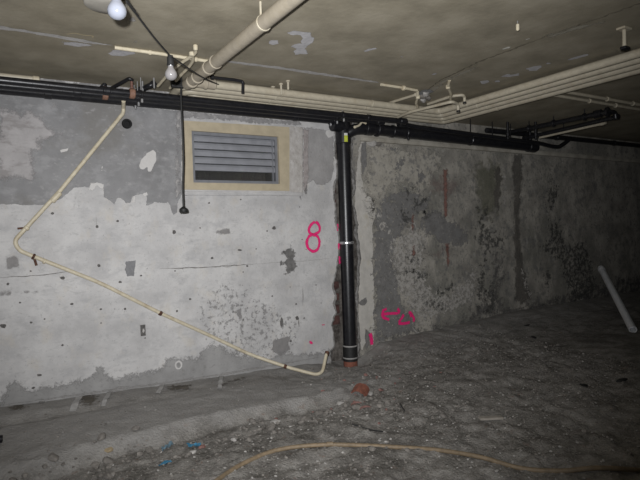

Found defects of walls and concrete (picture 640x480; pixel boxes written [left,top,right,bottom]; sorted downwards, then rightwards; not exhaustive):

peeling [288,31,314,55]
peeling [0,94,340,410]
crack [160,258,329,269]
peeling [351,138,483,358]
leakage [460,154,640,324]